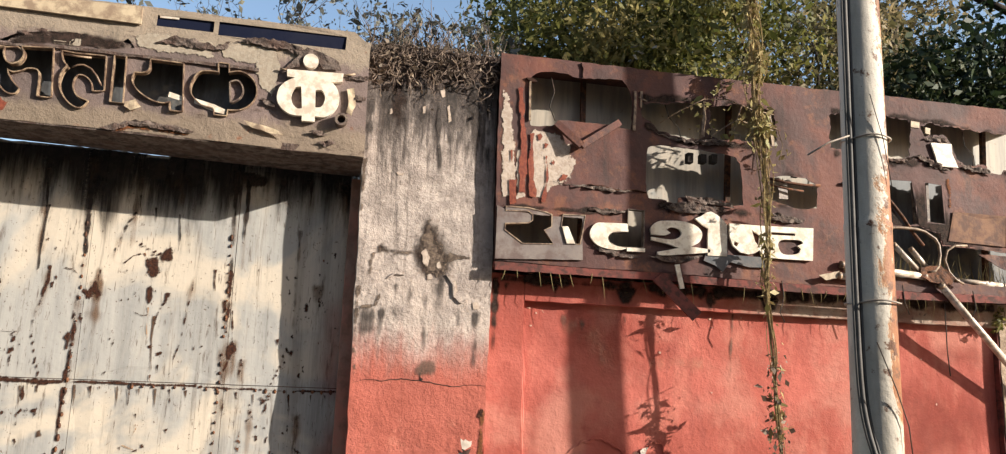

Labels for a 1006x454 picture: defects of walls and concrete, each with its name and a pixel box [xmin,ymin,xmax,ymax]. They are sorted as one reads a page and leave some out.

water stain [367,90,392,131]
water stain [420,81,493,171]
corrosion [38,165,57,305]
water stain [0,142,352,254]
water stain [225,258,234,333]
water stain [53,317,77,453]
corrosion [0,241,293,454]
corrosion [281,390,335,436]
crack [352,377,481,387]
spalling [459,409,485,454]